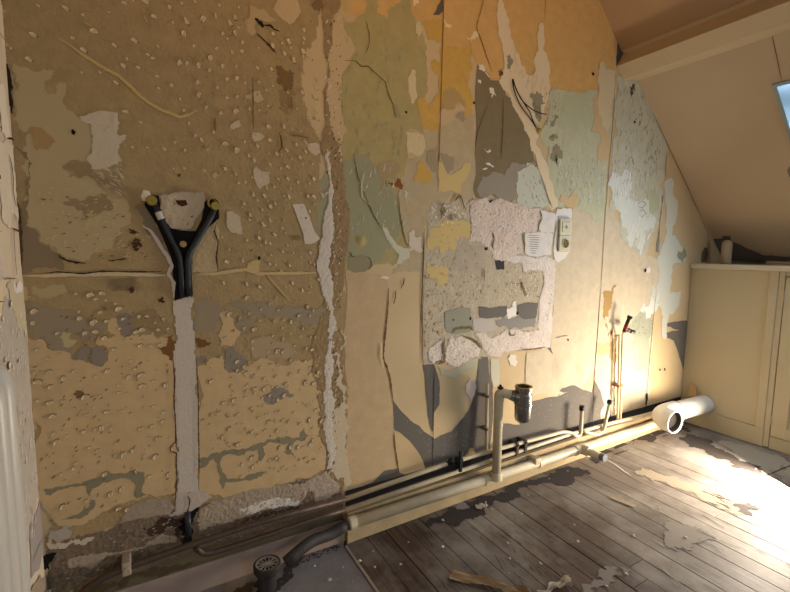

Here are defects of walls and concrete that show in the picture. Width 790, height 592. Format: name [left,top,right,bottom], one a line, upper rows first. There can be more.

flaking render [245,0,301,36]
flaking render [530,91,545,122]
flaking render [0,63,132,262]
flaking render [406,131,455,174]
flaking render [141,190,205,230]
flaking render [191,220,220,273]
flaking render [409,229,423,253]
flaking render [7,280,28,342]
flaking render [507,301,518,319]
damp [323,329,681,507]
flaking render [394,431,425,474]
damp [224,500,308,530]